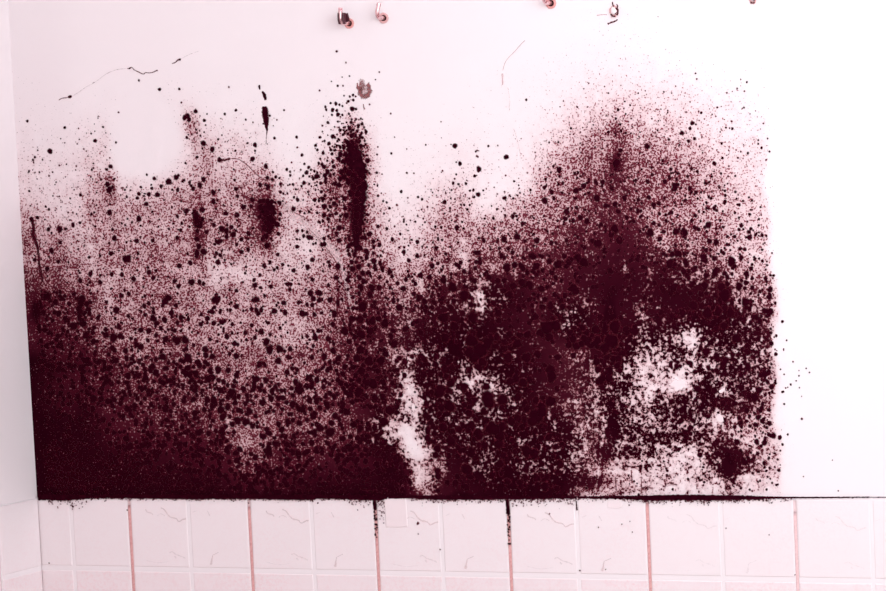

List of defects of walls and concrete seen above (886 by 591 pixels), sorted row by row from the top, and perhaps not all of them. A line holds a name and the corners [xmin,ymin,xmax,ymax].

water stain [18,58,810,510]